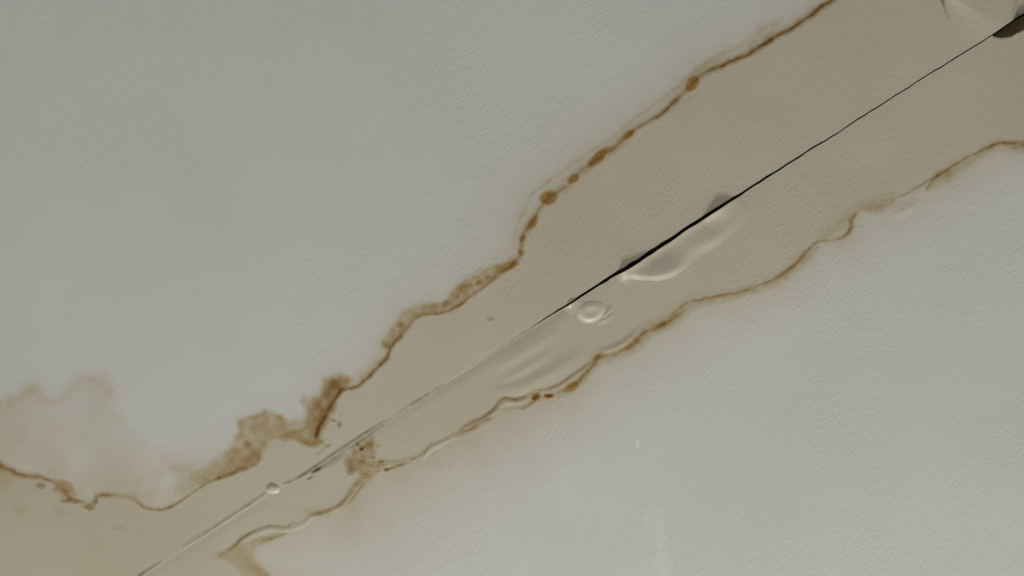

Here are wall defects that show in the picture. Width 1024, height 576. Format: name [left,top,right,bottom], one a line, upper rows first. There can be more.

damp [0,370,166,506]
damp [0,458,195,513]
crack [135,558,166,576]
damp [153,0,842,507]
damp [145,154,1024,576]
crack [181,14,1024,549]
damp [341,33,1024,477]